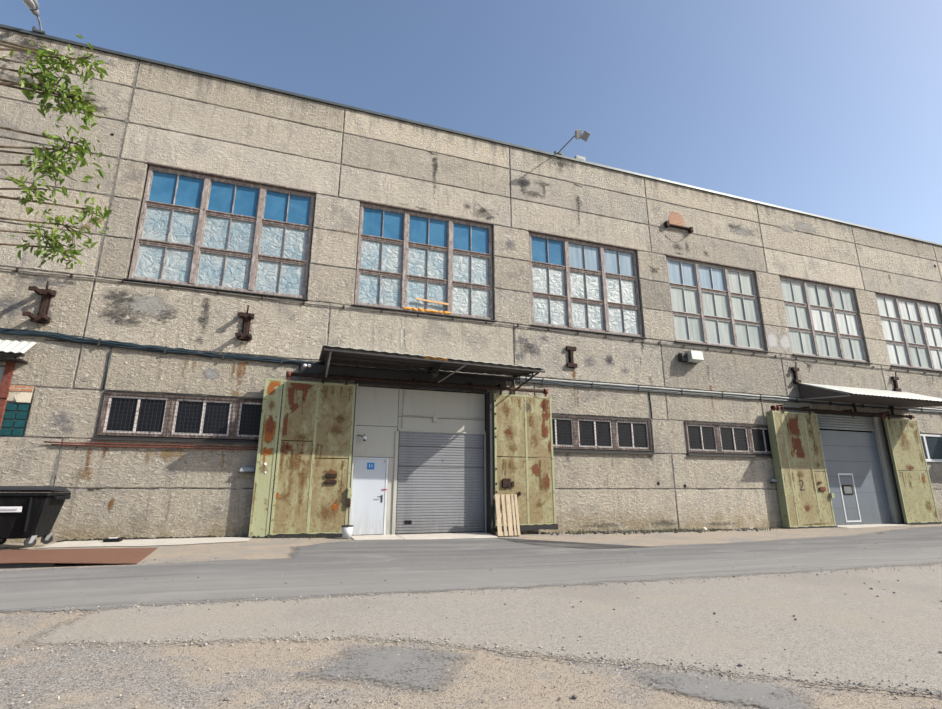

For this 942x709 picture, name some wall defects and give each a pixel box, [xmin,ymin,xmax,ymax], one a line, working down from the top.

water stain [104,291,175,324]
rust [261,381,350,519]
rust [503,461,550,489]
rust [529,399,551,452]
rust [780,415,819,487]